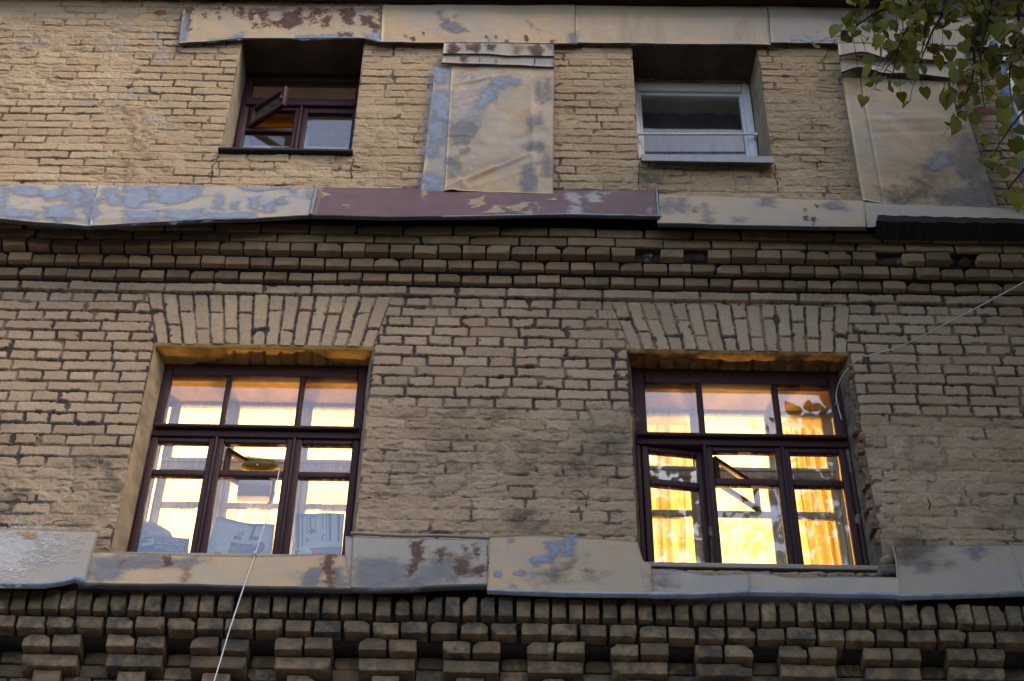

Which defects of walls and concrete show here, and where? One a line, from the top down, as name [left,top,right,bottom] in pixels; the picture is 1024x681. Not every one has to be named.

peeling [296,32,381,42]
peeling [421,67,521,199]
peeling [467,142,607,214]
peeling [0,184,330,223]
corrosion [321,554,337,588]
corrosion [408,540,487,576]
peeling [494,533,577,586]